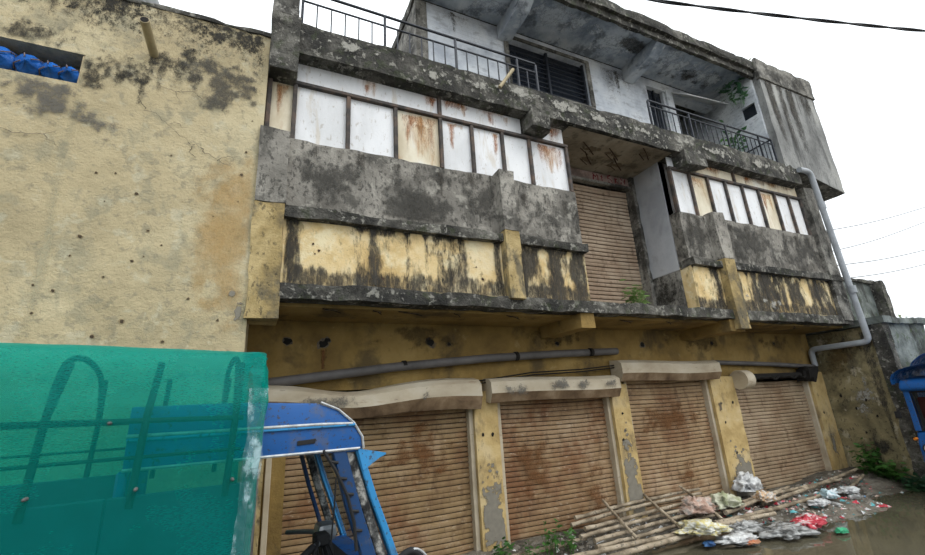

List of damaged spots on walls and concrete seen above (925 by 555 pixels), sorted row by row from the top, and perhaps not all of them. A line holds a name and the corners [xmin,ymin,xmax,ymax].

water stain [0,0,263,131]
crack [138,93,235,165]
water stain [764,69,814,150]
water stain [301,146,365,205]
water stain [384,164,494,224]
water stain [518,194,568,234]
water stain [282,219,505,296]
water stain [521,246,591,301]
water stain [823,332,897,461]
flaking render [622,412,645,518]
flaking render [482,463,507,551]